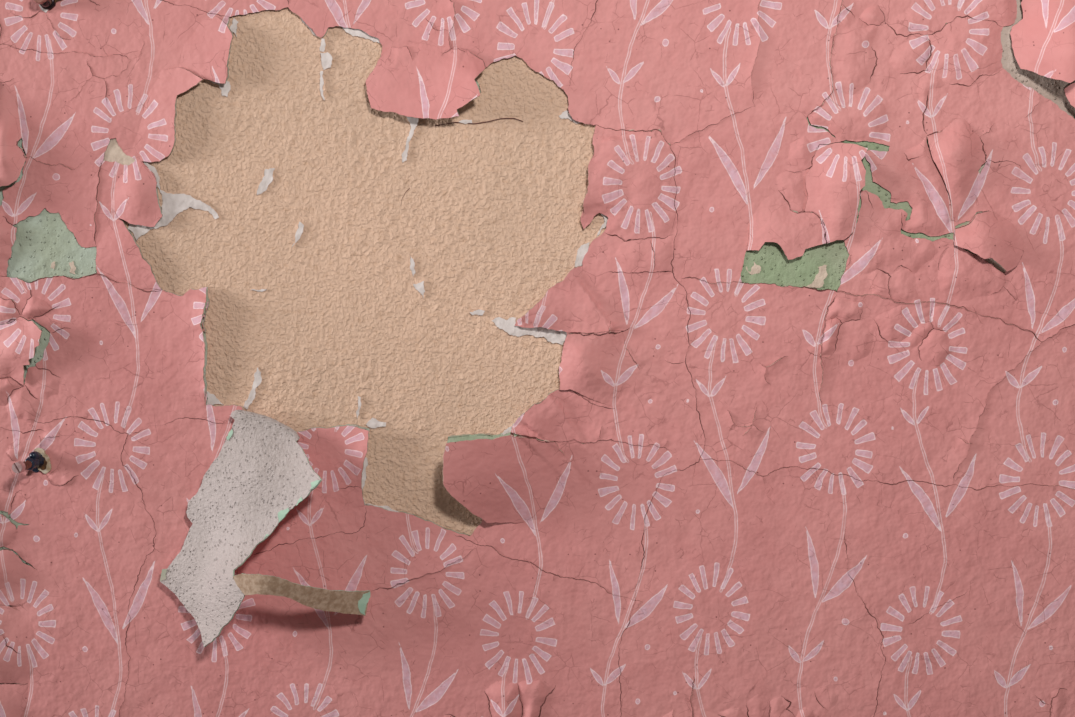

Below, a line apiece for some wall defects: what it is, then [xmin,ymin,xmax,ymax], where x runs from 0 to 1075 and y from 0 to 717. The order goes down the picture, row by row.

crack [810,0,843,114]
peeling [1001,0,1075,119]
flaking render [0,8,638,535]
crack [455,93,1070,717]
peeling [0,492,48,717]